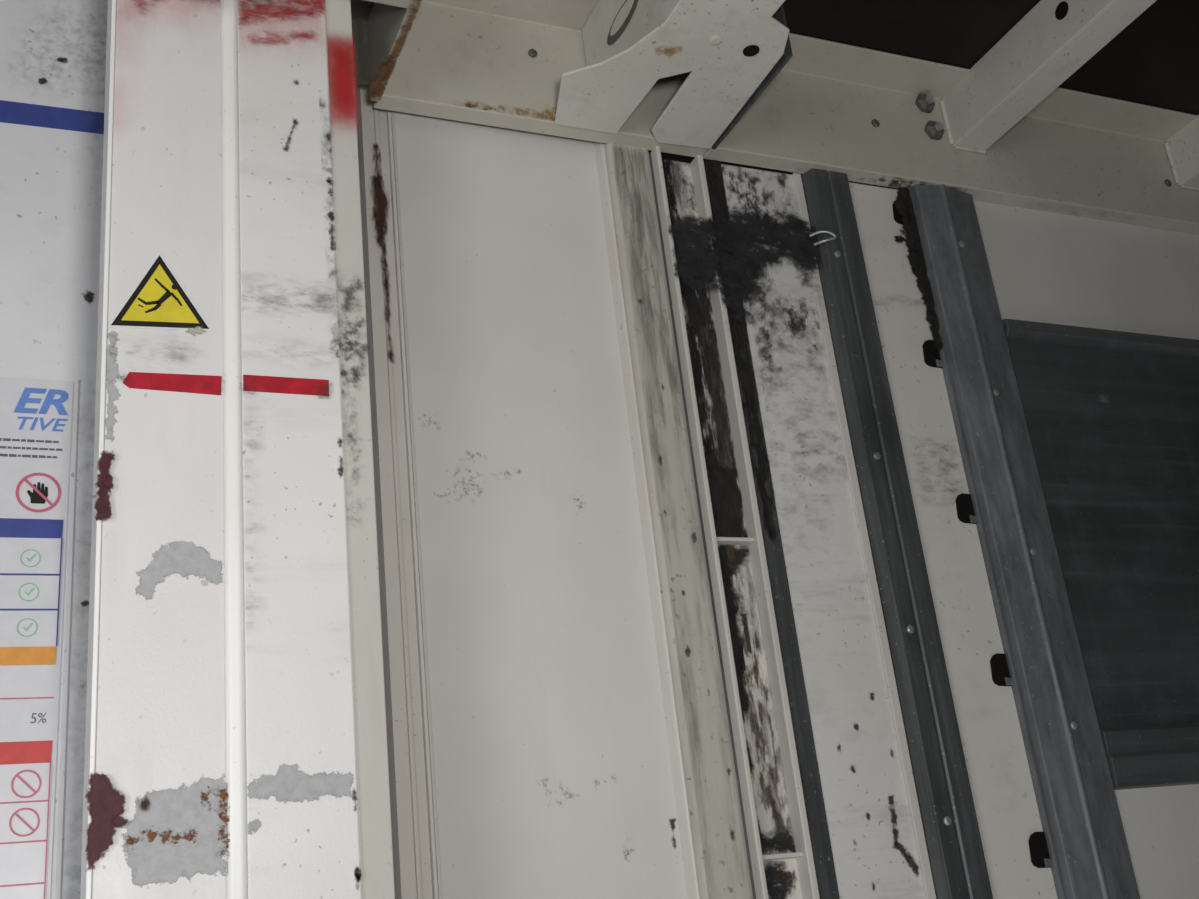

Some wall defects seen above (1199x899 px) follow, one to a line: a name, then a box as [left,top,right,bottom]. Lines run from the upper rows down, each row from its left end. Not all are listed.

rust [367,0,421,100]
rust [467,102,555,121]
spalling [328,212,336,250]
leakage [662,158,822,370]
peeling [93,331,121,520]
leakage [686,321,748,538]
peeling [135,541,223,600]
peeling [85,773,230,887]
peeling [248,819,261,835]
peeling [247,764,357,810]